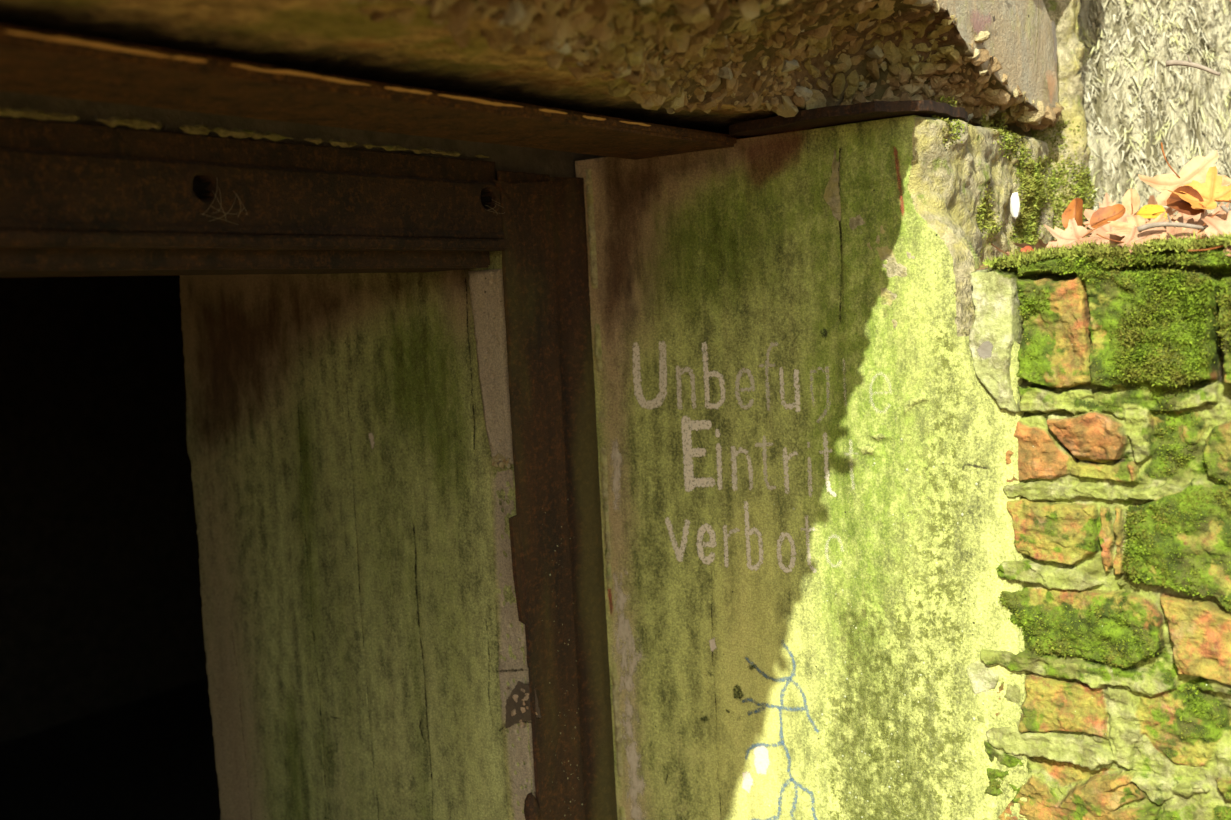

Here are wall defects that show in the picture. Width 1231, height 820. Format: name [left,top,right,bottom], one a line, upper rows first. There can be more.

spalling [328,0,1064,132]
damp [977,341,993,359]
damp [611,440,622,509]
efflorescence [613,573,644,820]
damp [833,654,928,820]
rust [524,792,540,820]